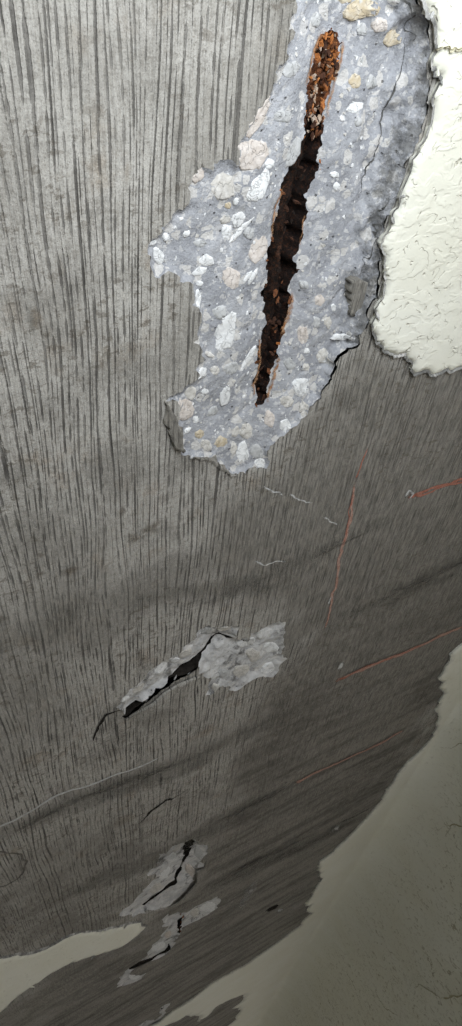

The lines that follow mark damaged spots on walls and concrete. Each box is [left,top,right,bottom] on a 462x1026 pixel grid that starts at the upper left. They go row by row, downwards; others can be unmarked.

spalling [147,0,462,477]
corrosion [325,449,368,628]
spalling [117,621,287,714]
spalling [0,839,221,987]